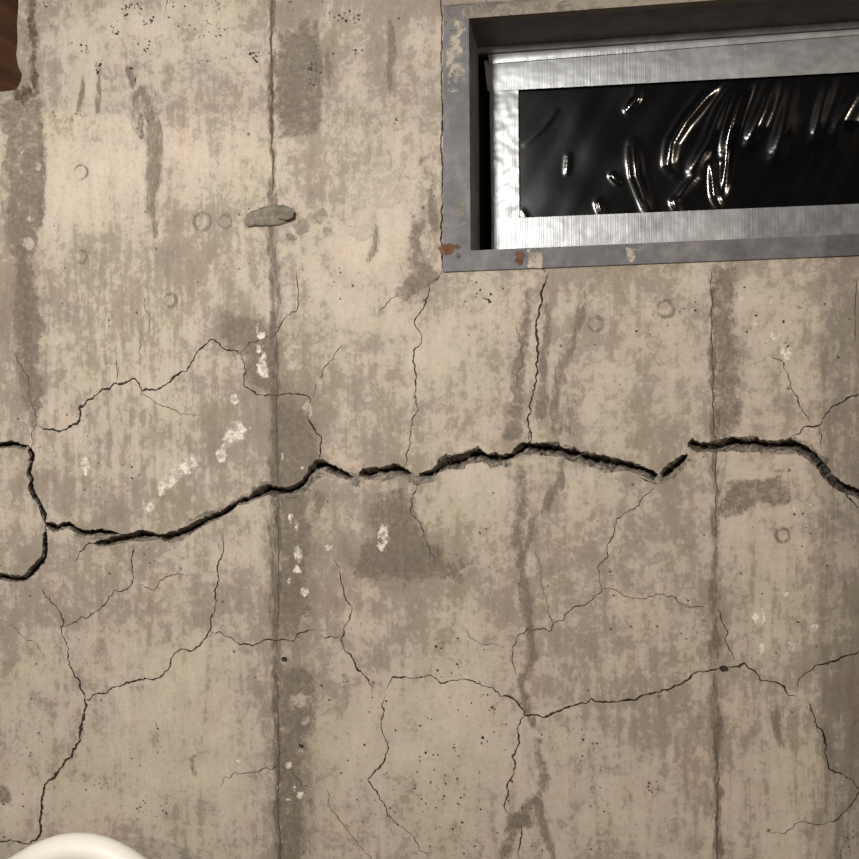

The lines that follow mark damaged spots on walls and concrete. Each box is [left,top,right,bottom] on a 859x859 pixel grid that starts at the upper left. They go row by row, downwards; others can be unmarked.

water stain [273,19,331,138]
crack [437,0,445,245]
water stain [0,98,46,424]
water stain [351,489,472,580]
crack [0,254,859,859]